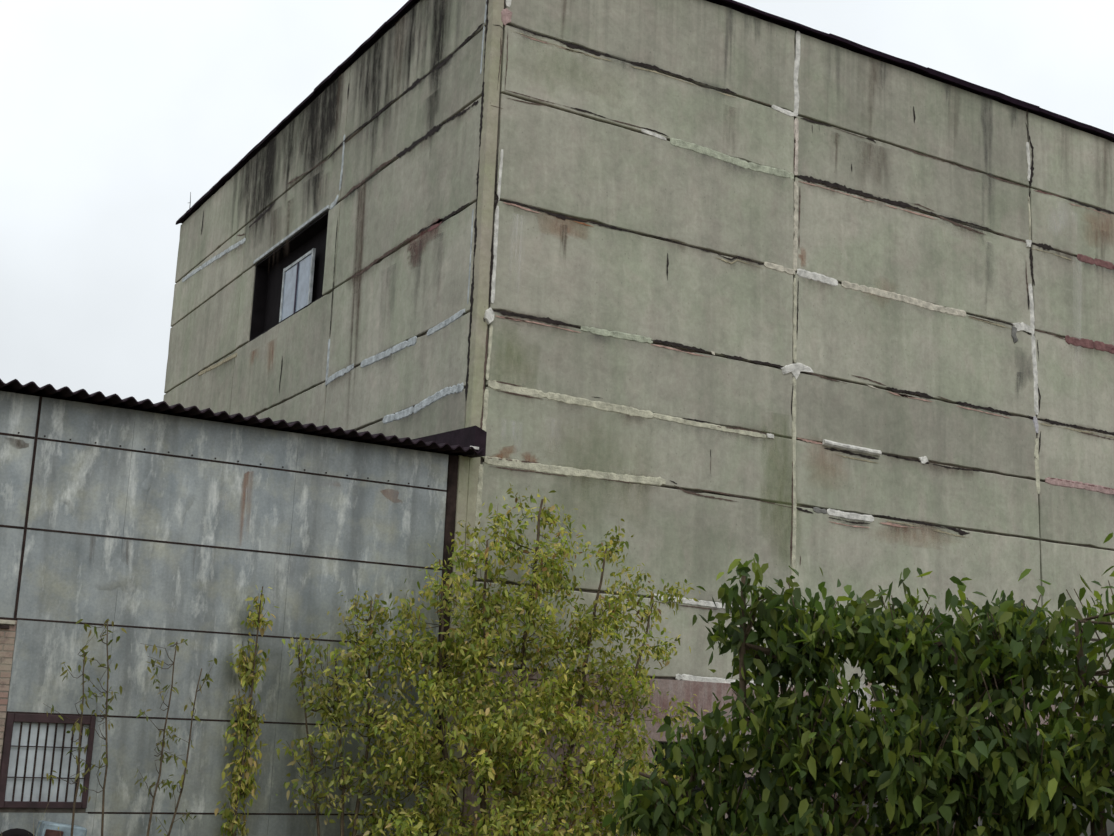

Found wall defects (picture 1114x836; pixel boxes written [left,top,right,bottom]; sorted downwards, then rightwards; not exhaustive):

water stain [243,76,340,224]
water stain [352,183,365,329]
water stain [360,38,391,117]
water stain [405,0,445,101]
crack [237,0,771,429]
crack [794,106,1114,329]
crack [489,458,565,476]
crack [651,340,1114,565]